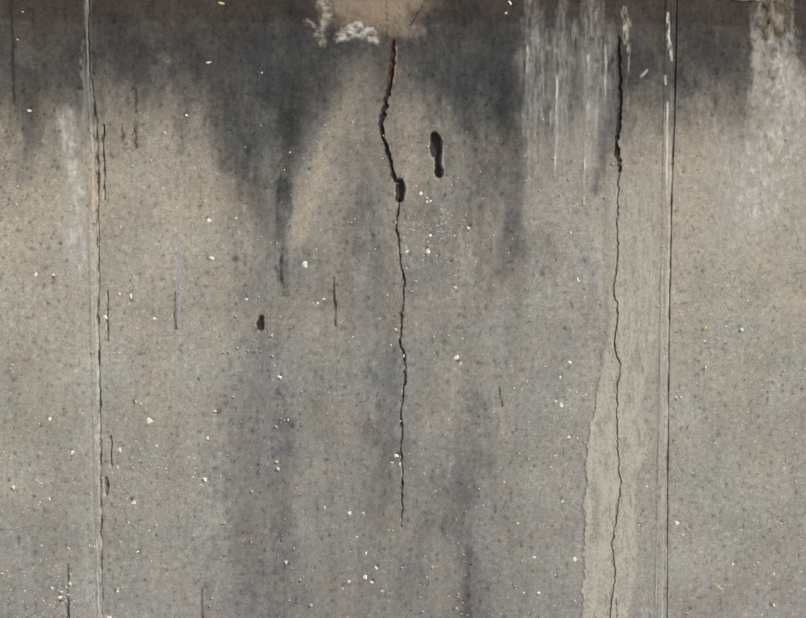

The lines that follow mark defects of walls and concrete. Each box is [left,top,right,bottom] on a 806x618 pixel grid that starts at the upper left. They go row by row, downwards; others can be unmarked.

peeling [318,0,429,43]
crack [379,38,397,182]
spalling [430,133,444,177]
leakage [717,4,805,240]
crack [399,256,407,460]
crack [613,41,622,516]